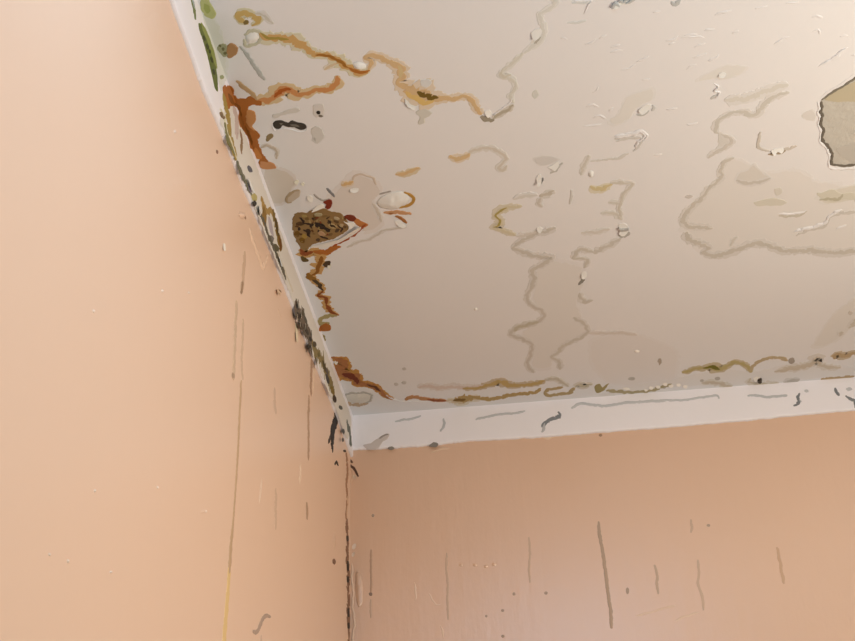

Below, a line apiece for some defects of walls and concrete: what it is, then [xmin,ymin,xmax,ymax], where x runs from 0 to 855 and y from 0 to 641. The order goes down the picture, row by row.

peeling [611,0,635,10]
water stain [191,0,229,91]
water stain [311,104,325,144]
peeling [816,73,855,171]
water stain [395,167,421,178]
water stain [448,145,510,172]
water stain [678,81,855,259]
spalling [292,195,361,251]
water stain [489,179,855,397]
water stain [299,359,315,483]
mould [328,413,346,466]